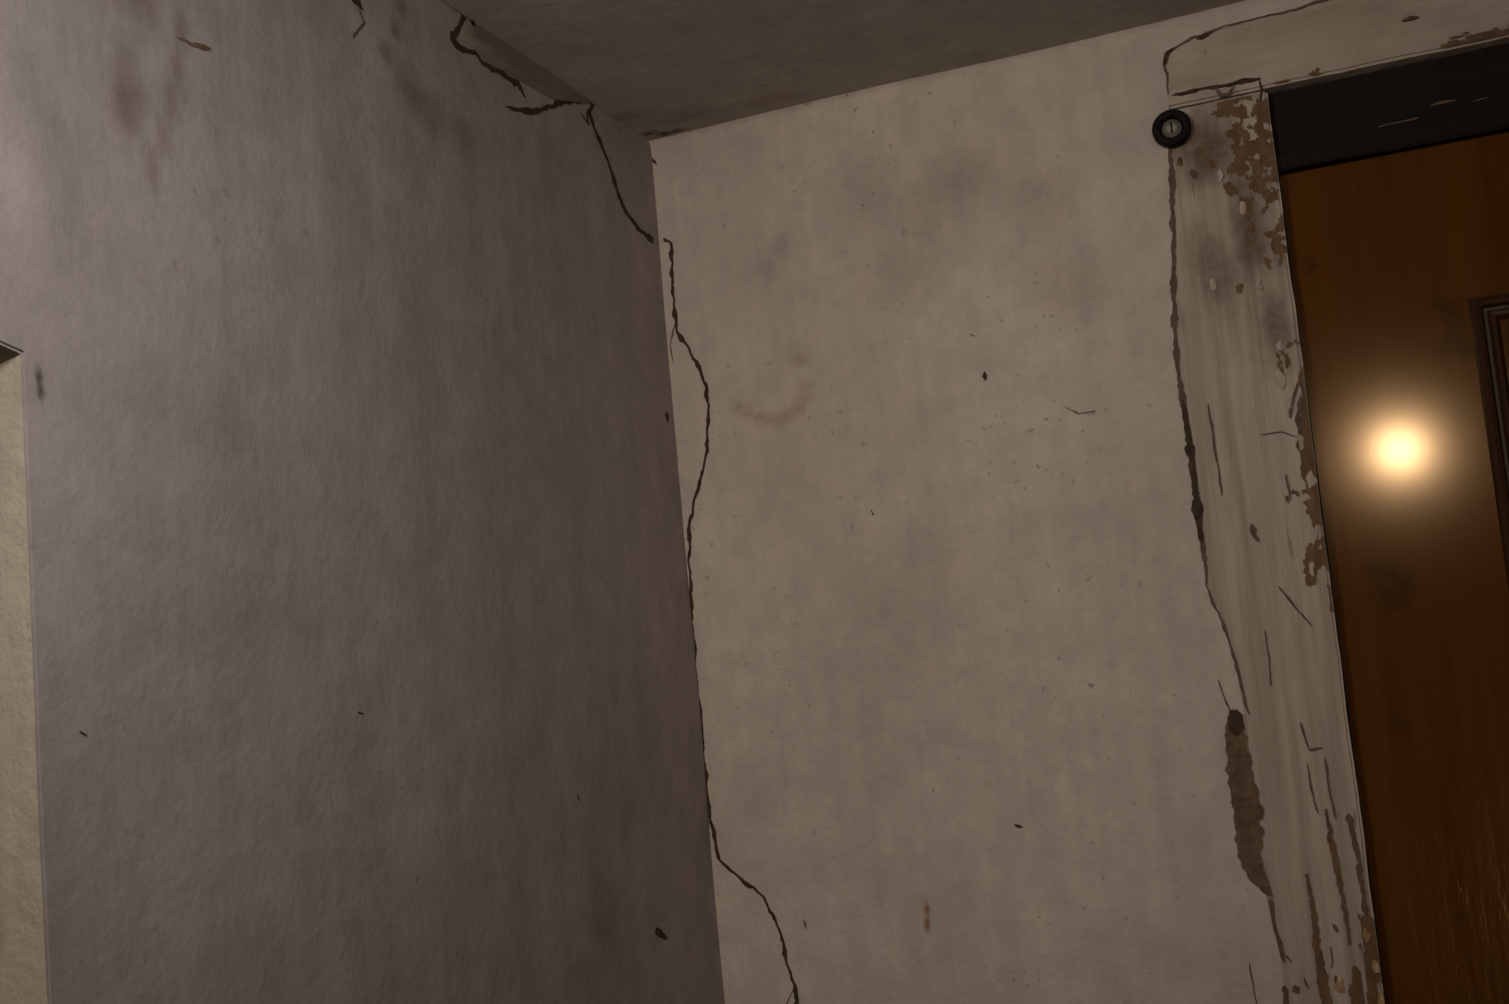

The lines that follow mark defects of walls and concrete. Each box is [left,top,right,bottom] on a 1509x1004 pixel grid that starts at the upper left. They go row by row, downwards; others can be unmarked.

crack [351,0,365,39]
peeling [1440,27,1509,48]
peeling [1176,79,1289,294]
crack [441,0,799,1004]
peeling [1261,314,1333,611]
spalling [1224,709,1273,896]
peeling [1292,722,1385,1004]